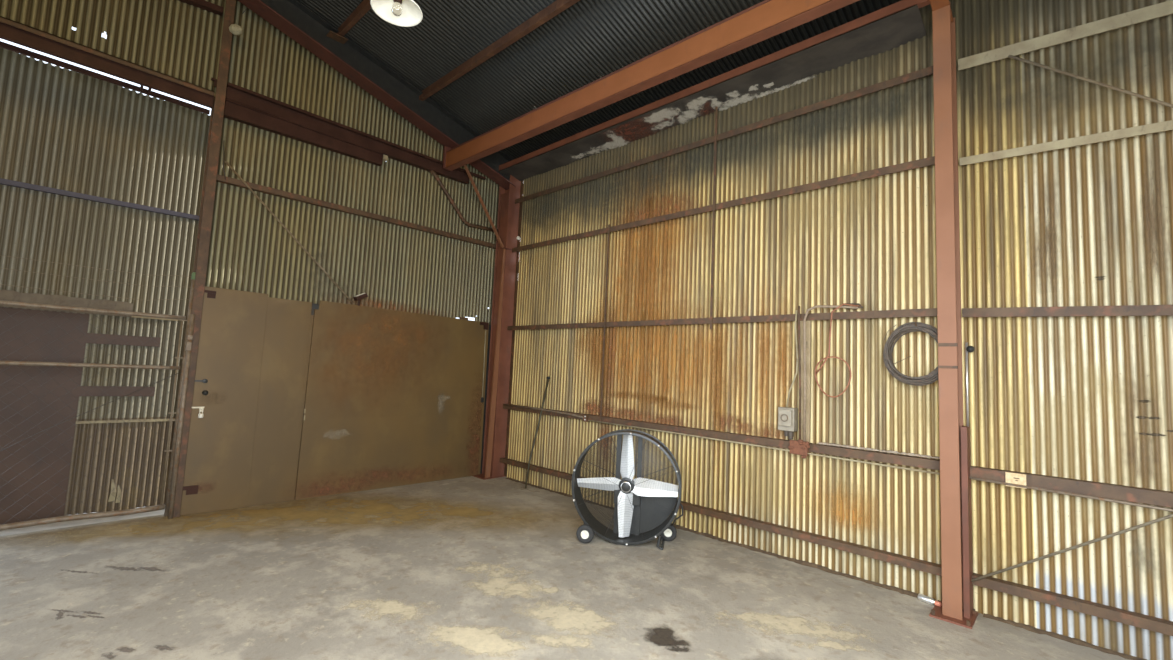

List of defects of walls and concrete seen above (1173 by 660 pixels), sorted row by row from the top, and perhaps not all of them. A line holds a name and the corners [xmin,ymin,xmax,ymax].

peeling [644,76,815,130]
peeling [572,130,629,159]